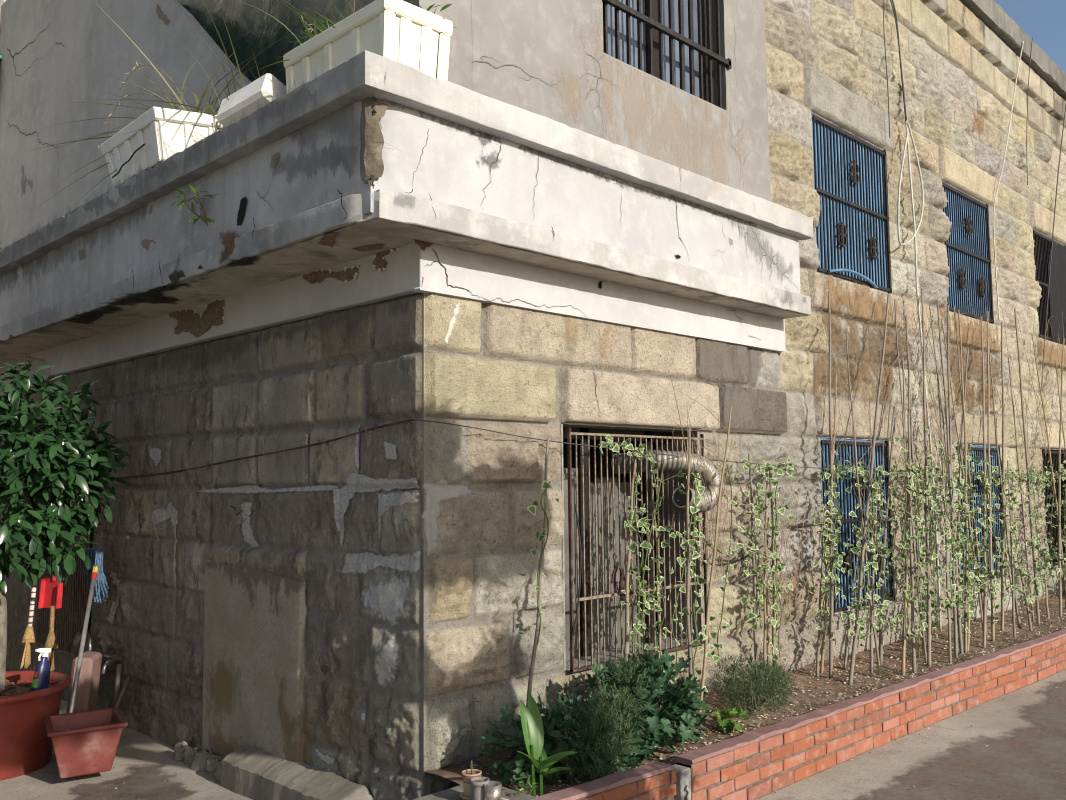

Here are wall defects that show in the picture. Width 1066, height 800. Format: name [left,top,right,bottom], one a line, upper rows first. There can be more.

crack [6,24,65,76]
crack [471,0,611,135]
spalling [364,101,388,189]
crack [375,130,436,215]
damp [518,146,756,226]
peeling [169,299,225,338]
peeling [303,244,400,284]
crack [422,249,602,325]
peeling [362,577,411,626]
peeling [374,642,399,685]